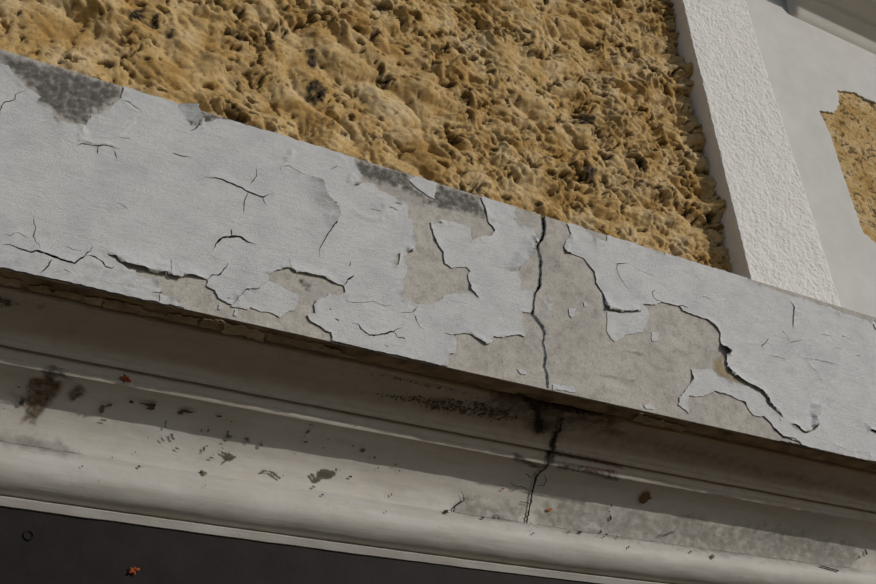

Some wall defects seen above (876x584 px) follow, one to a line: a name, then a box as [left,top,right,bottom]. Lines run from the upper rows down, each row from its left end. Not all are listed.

peeling [0,49,124,124]
peeling [178,103,263,130]
crack [6,220,113,273]
crack [208,169,273,279]
peeling [108,254,345,342]
peeling [354,158,822,445]
peeling [748,279,876,322]
damp [377,377,524,422]
crack [511,215,594,524]
peeling [814,443,870,461]